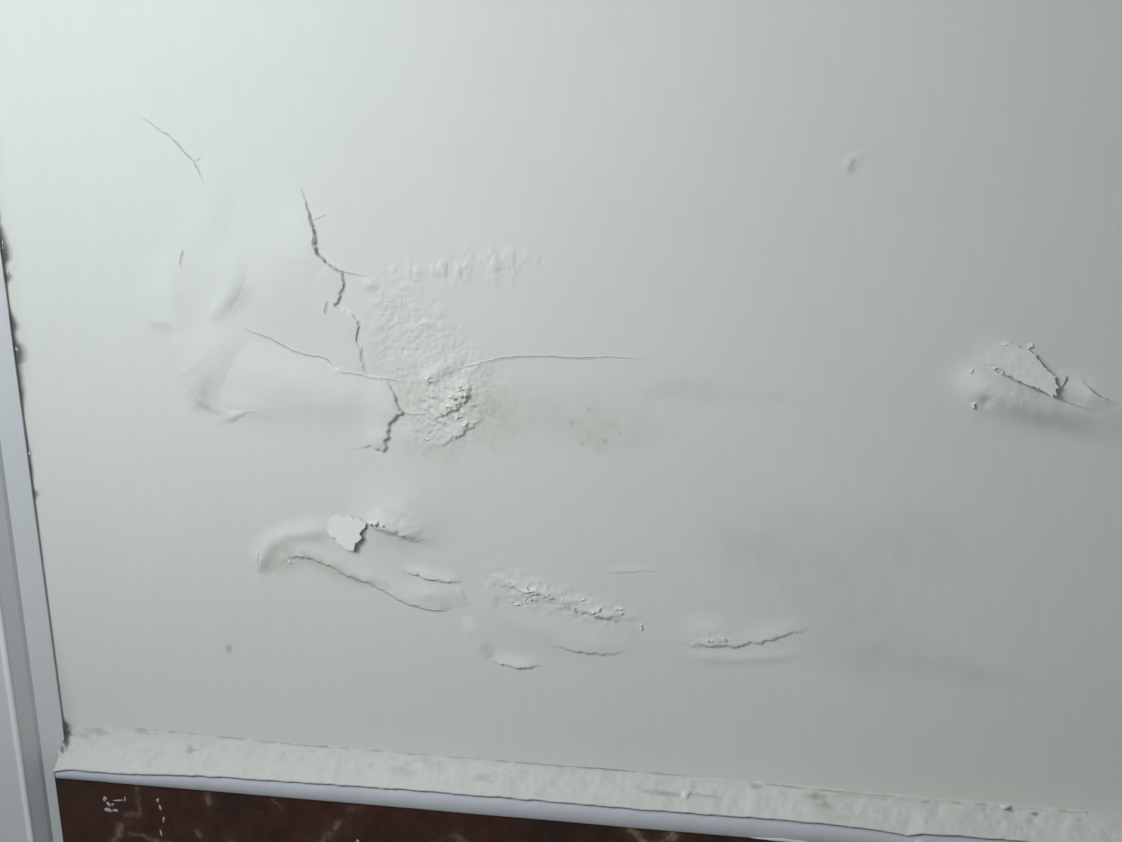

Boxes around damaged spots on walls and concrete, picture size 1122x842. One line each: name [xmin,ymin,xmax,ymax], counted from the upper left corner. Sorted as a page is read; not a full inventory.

crack [135,112,206,187]
crack [239,203,404,382]
crack [452,354,643,371]